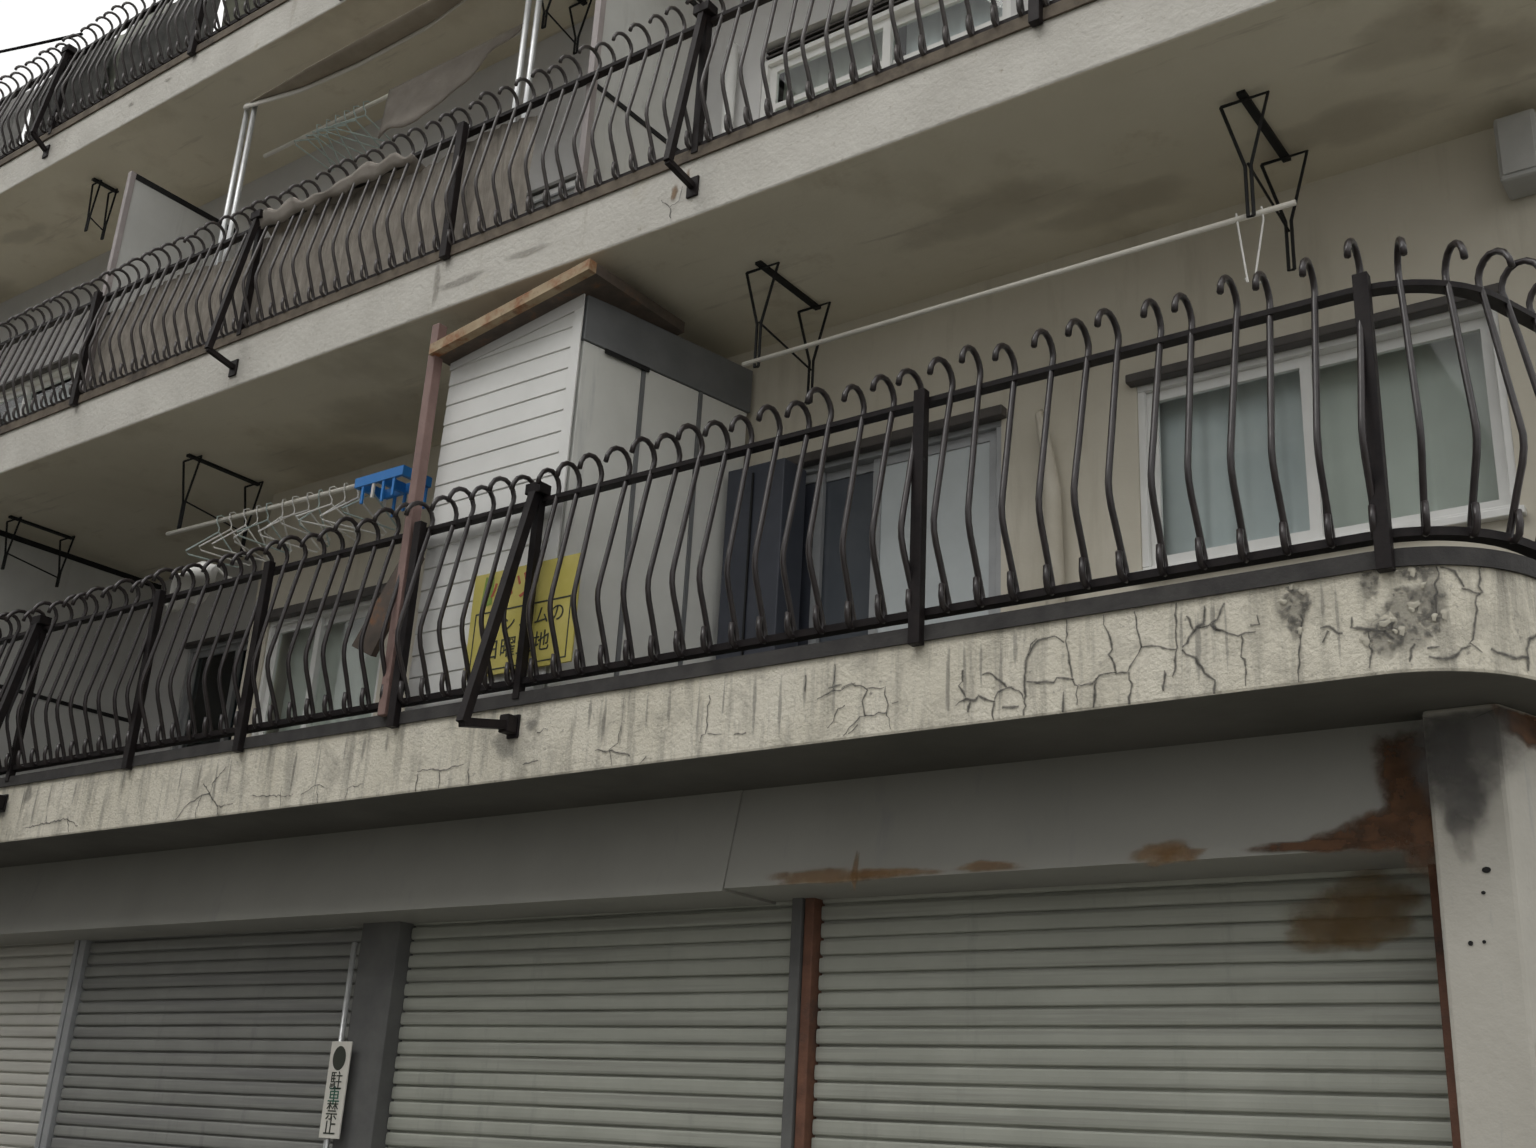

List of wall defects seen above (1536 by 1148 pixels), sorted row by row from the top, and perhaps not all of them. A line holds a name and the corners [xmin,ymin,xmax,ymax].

crack [804,667,898,736]
crack [955,602,1260,720]
spalling [1278,582,1310,635]
spalling [1359,567,1448,652]
crack [1297,566,1536,682]
corrosion [1252,733,1435,864]
water stain [1417,709,1516,829]
corrosion [781,859,936,885]